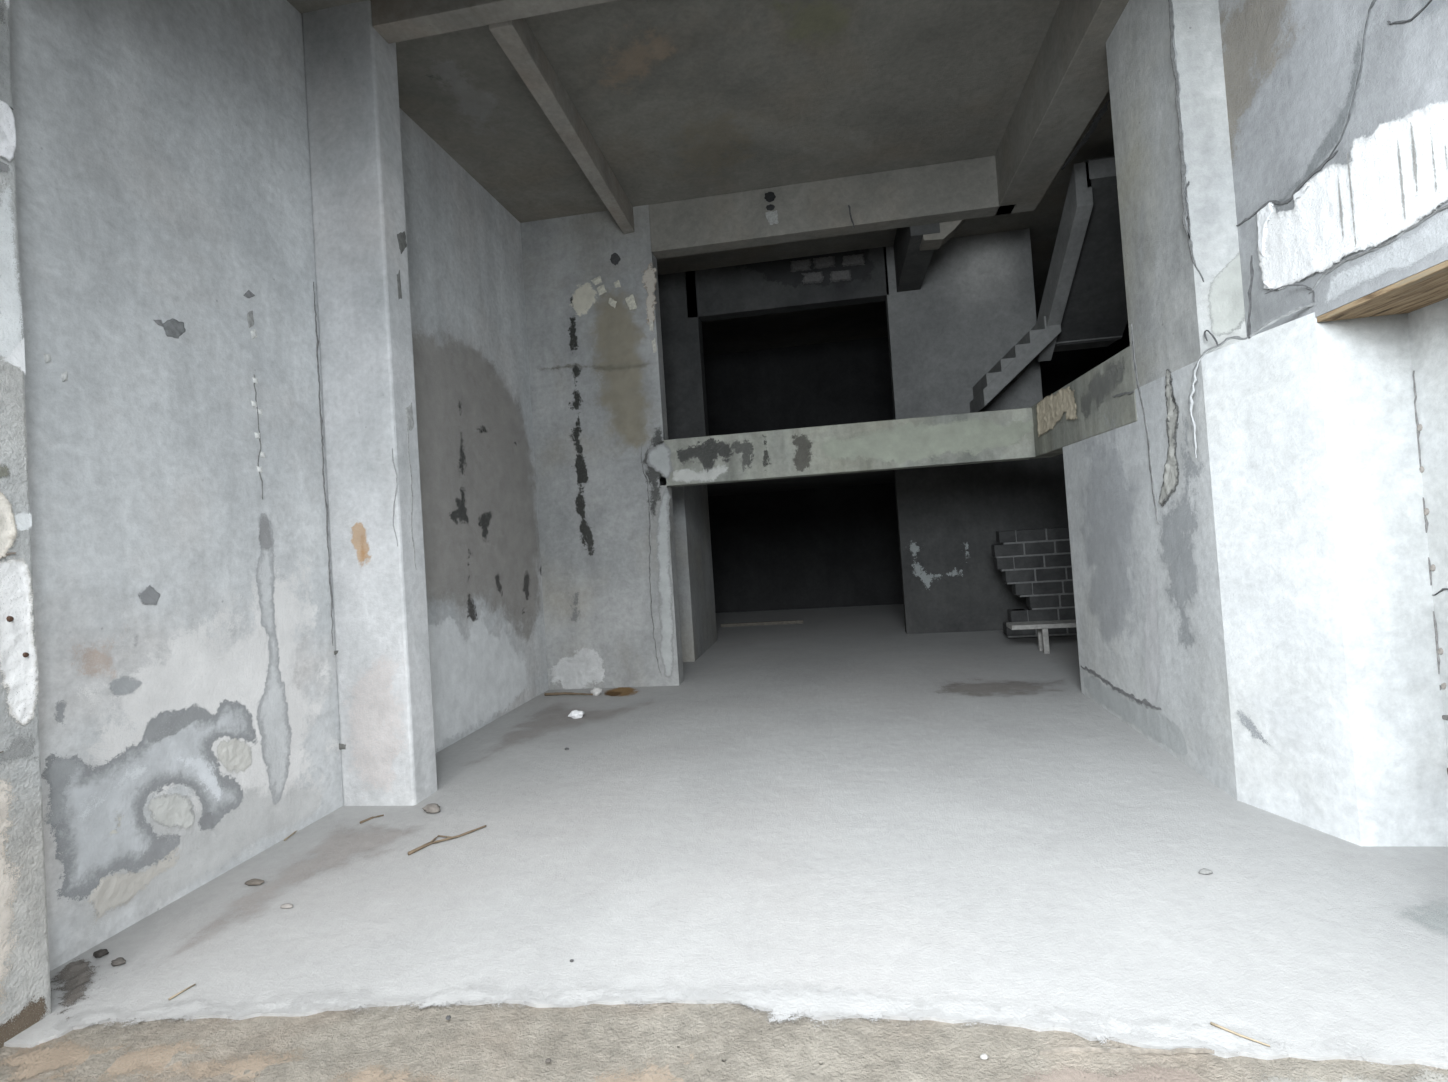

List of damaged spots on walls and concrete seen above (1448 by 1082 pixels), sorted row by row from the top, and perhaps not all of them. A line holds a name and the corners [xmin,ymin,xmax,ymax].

peeling [0,100,17,162]
peeling [569,262,658,353]
crack [1168,0,1204,282]
crack [1188,0,1448,458]
spalling [1257,99,1448,290]
spalling [0,492,40,729]
damp [0,512,425,966]
rust [351,521,371,569]
damp [412,317,542,642]
crack [1081,666,1161,710]
crack [1412,370,1448,690]